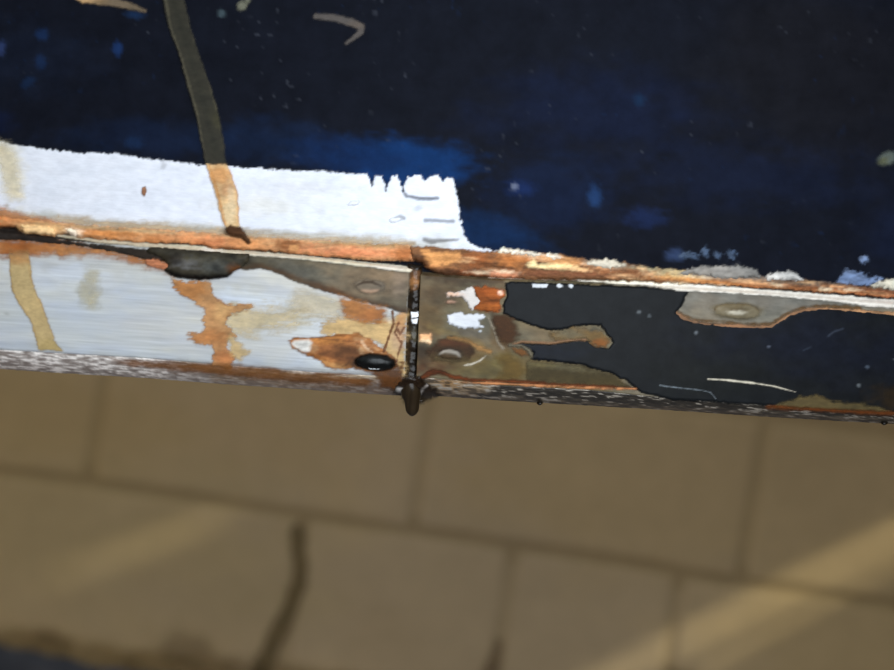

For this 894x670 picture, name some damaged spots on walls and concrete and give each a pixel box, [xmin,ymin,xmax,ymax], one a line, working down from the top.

damp [163,0,251,244]
damp [0,208,50,222]
corrosion [0,220,227,351]
corrosion [122,279,409,390]
peeling [241,255,419,324]
corrosion [420,285,637,390]
peeling [676,305,894,328]
crack [253,525,307,670]